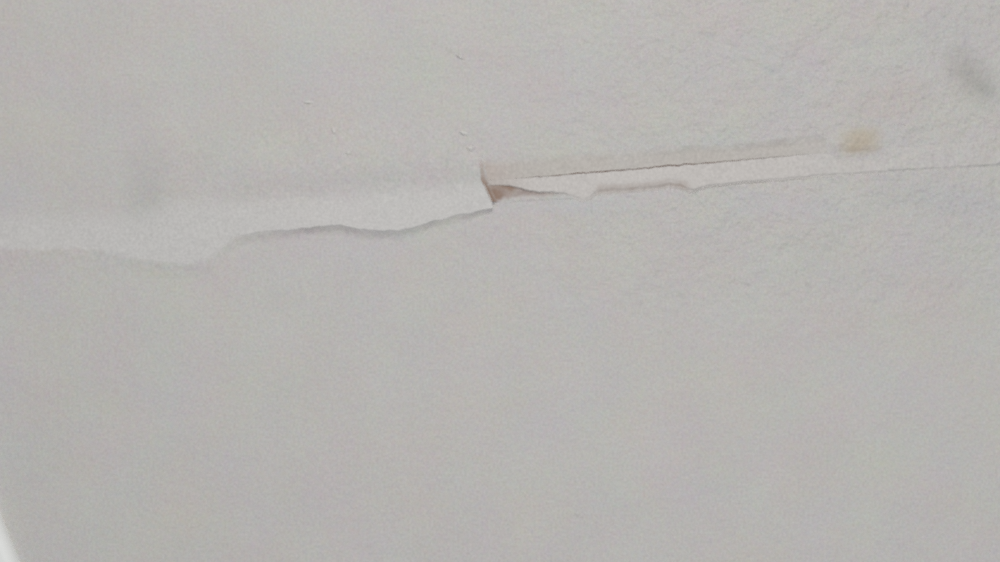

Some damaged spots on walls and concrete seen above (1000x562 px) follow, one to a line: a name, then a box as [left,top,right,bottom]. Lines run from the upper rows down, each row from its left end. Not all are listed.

crack [514,154,802,179]